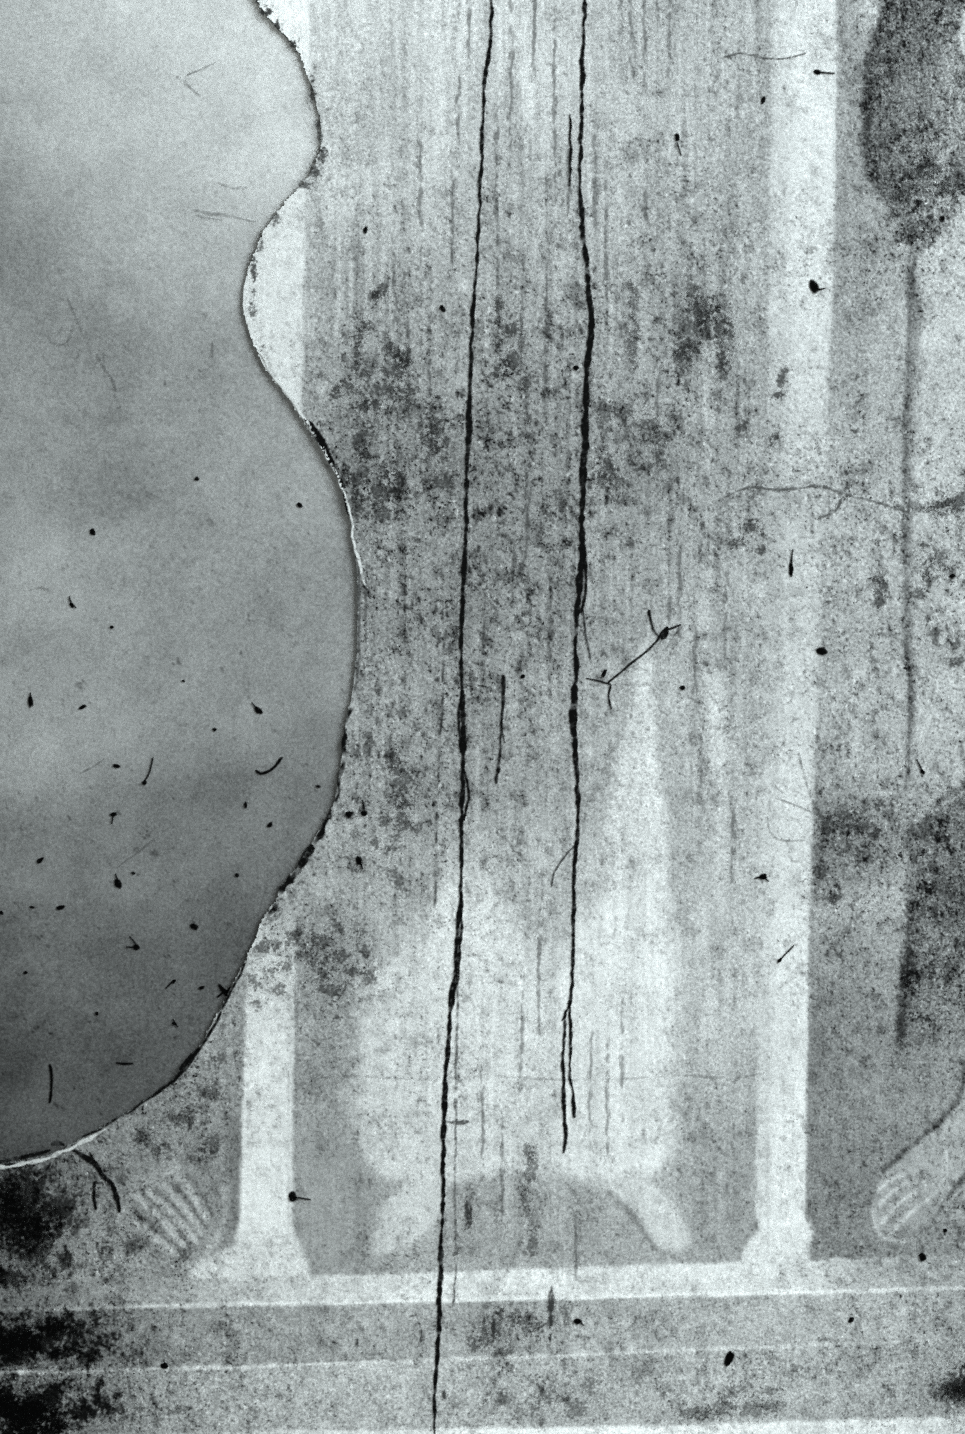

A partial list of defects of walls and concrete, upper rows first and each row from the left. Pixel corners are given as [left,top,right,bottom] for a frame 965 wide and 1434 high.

spalling [255,0,300,52]
spalling [293,67,329,190]
spalling [249,213,281,317]
peeling [257,281,463,585]
crack [552,0,681,1153]
crack [433,0,506,1434]
flaking render [0,1129,106,1169]
leakage [0,1158,87,1289]
leakage [0,1294,144,1434]
leakage [934,1365,965,1407]